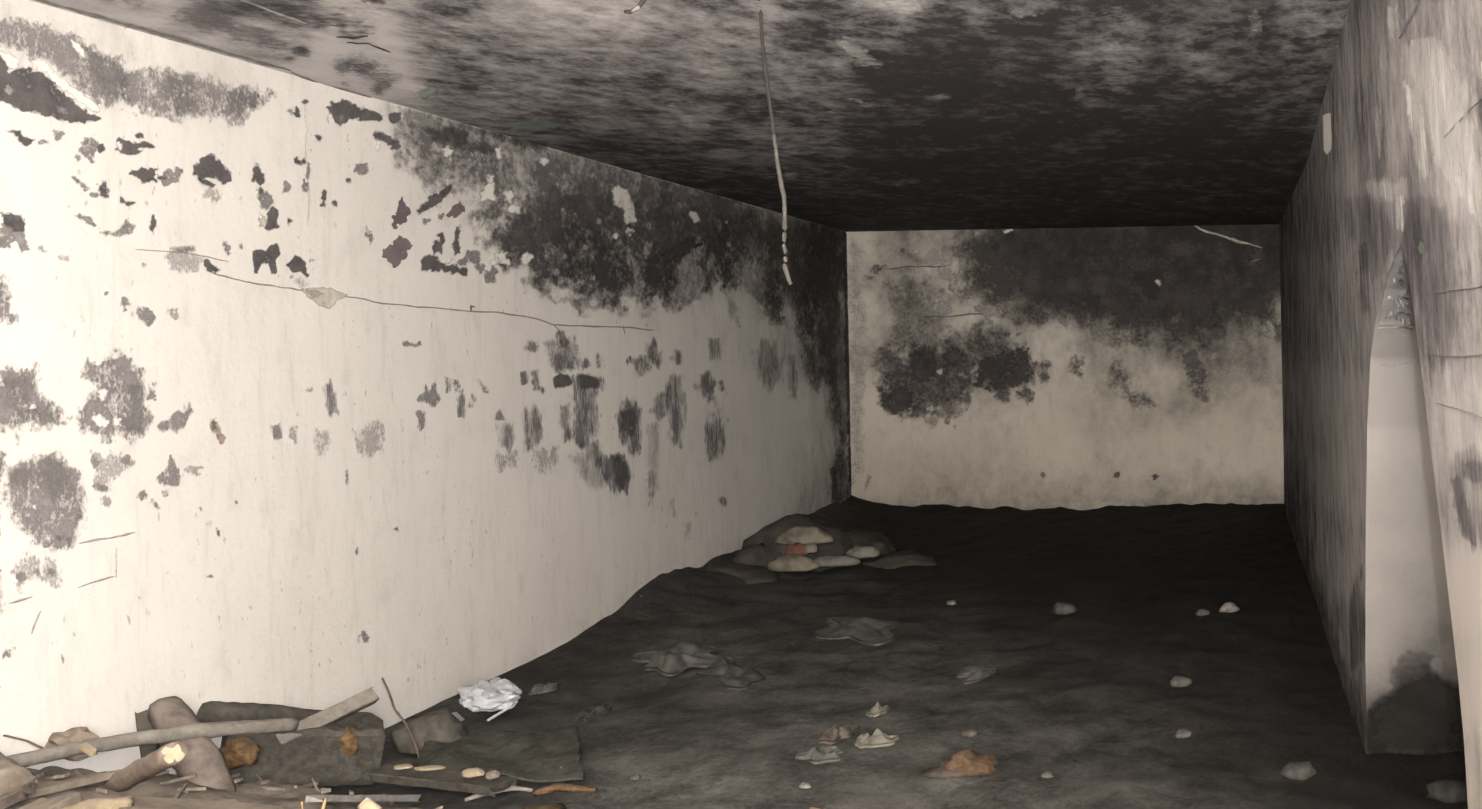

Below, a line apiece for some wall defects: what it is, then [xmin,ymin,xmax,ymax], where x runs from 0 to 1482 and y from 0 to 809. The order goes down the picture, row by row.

peeling [0,51,232,235]
damp [0,18,274,125]
peeling [283,47,308,61]
peeling [327,54,401,182]
damp [425,127,536,154]
damp [1323,113,1332,154]
peeling [0,213,44,252]
peeling [167,157,347,309]
peeling [365,142,567,283]
crack [135,249,653,343]
damp [878,281,1034,415]
damp [1451,460,1480,545]